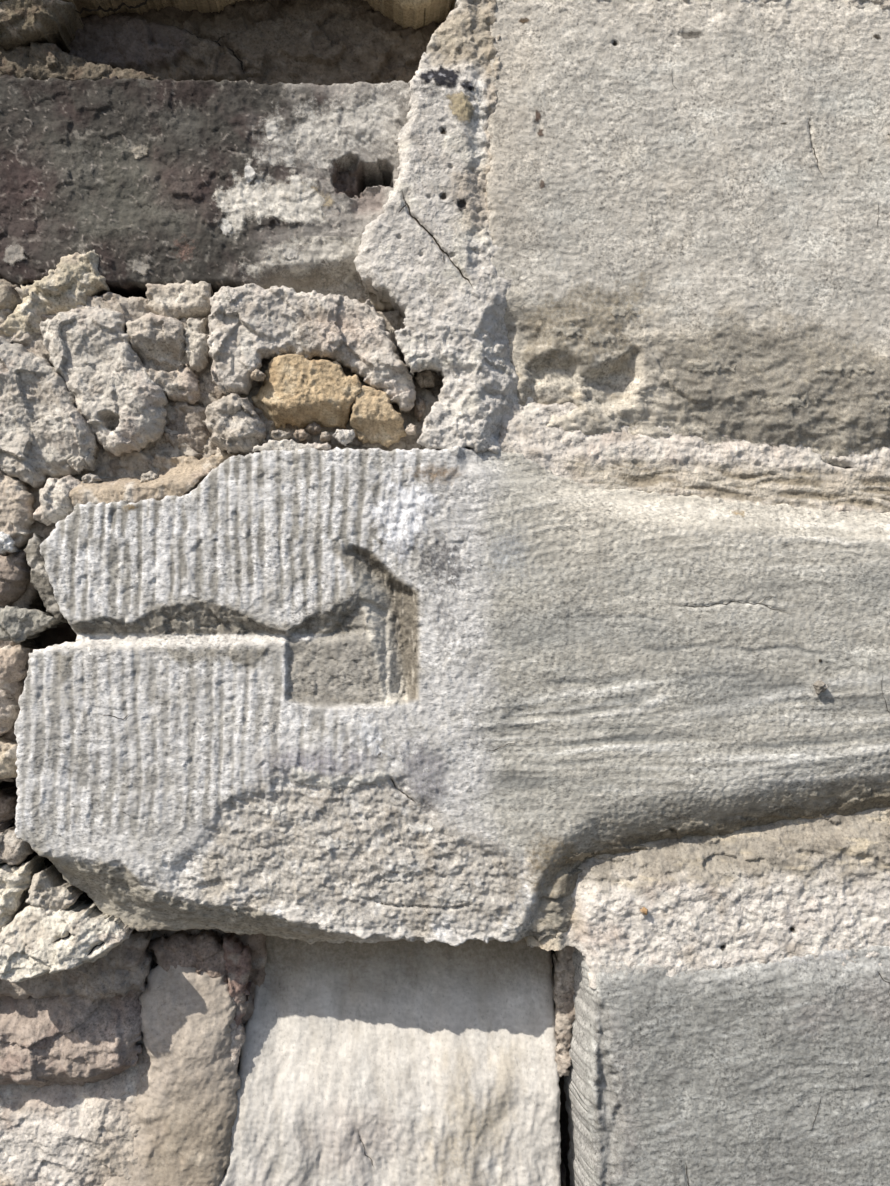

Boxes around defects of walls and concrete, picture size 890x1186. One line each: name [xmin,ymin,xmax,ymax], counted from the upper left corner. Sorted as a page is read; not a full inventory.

crack [75,0,147,14]
crack [399,192,472,286]